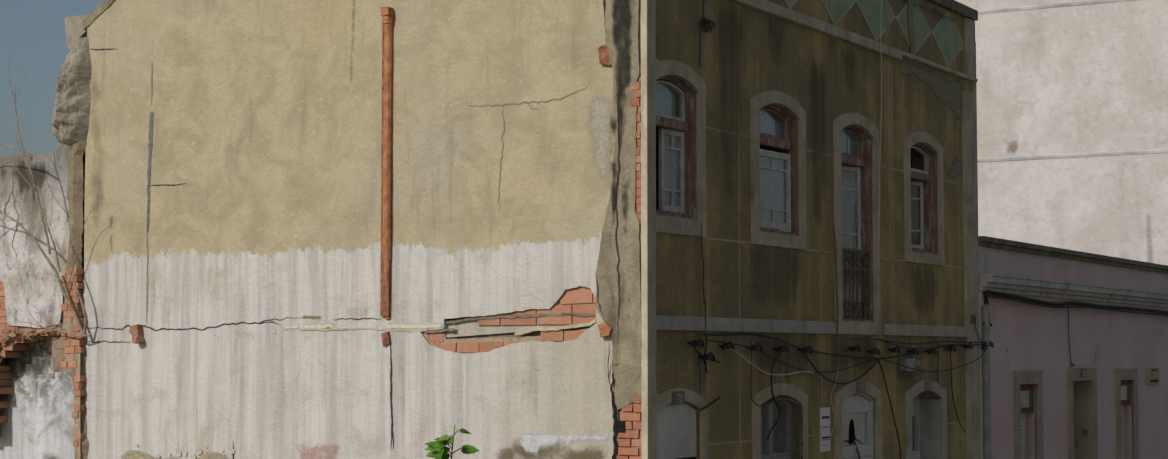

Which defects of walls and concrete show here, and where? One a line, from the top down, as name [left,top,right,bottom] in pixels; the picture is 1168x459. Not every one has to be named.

flaking render [271,286,597,354]